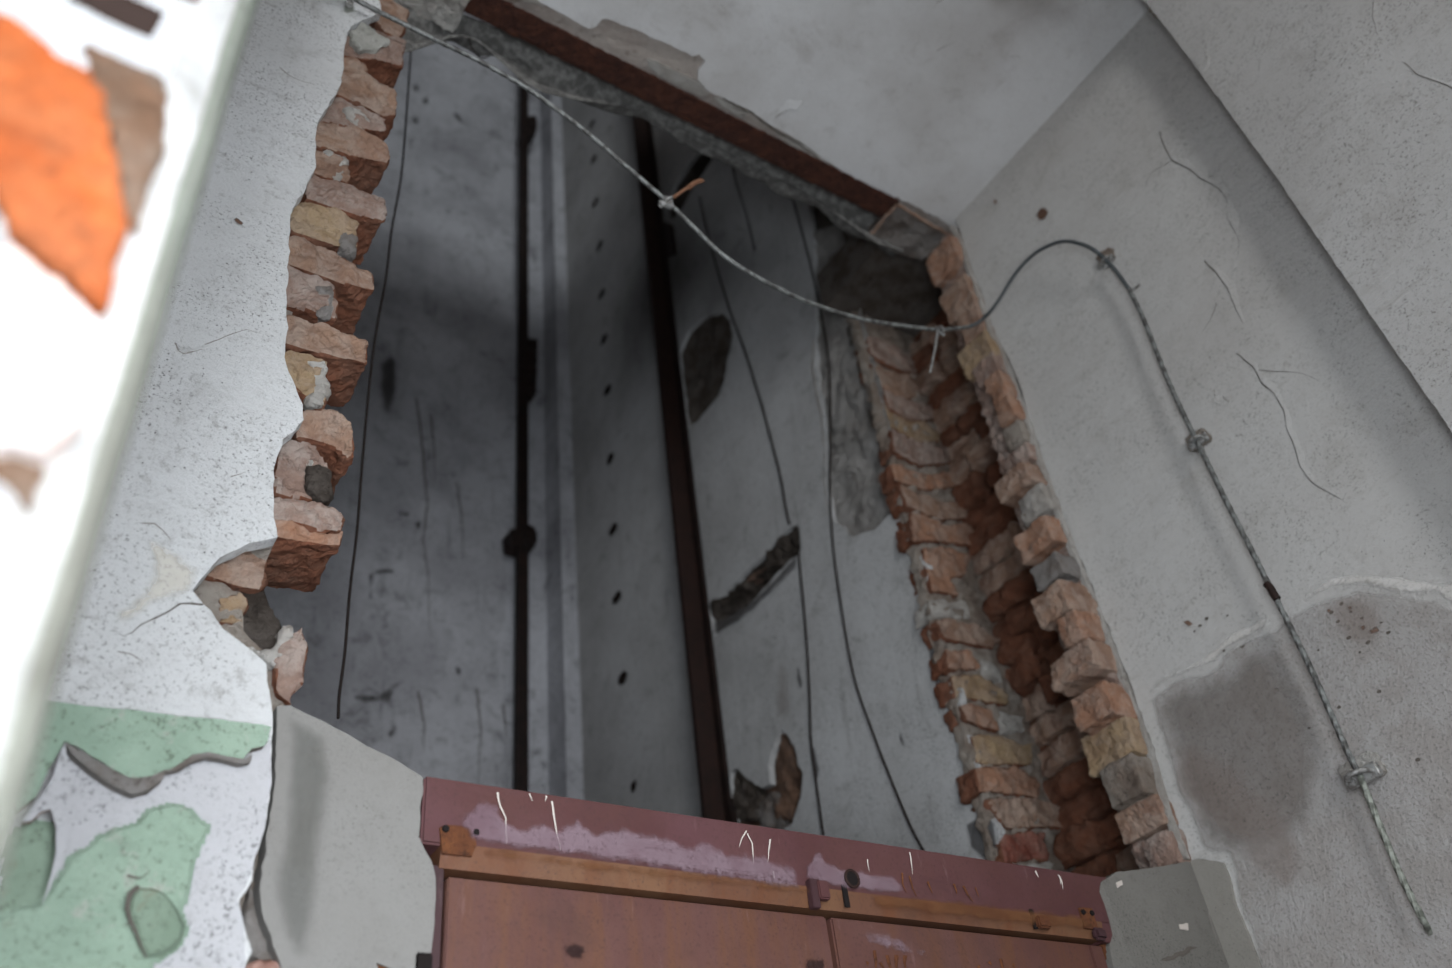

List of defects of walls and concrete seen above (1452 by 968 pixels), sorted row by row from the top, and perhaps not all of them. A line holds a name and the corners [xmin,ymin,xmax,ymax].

crack [1404,62,1452,88]
peeling [382,358,394,407]
flaking render [813,225,891,537]
crack [1144,131,1341,499]
peeling [0,701,272,968]
spalling [732,733,819,830]
peeling [967,820,996,857]
water stain [1155,576,1452,968]